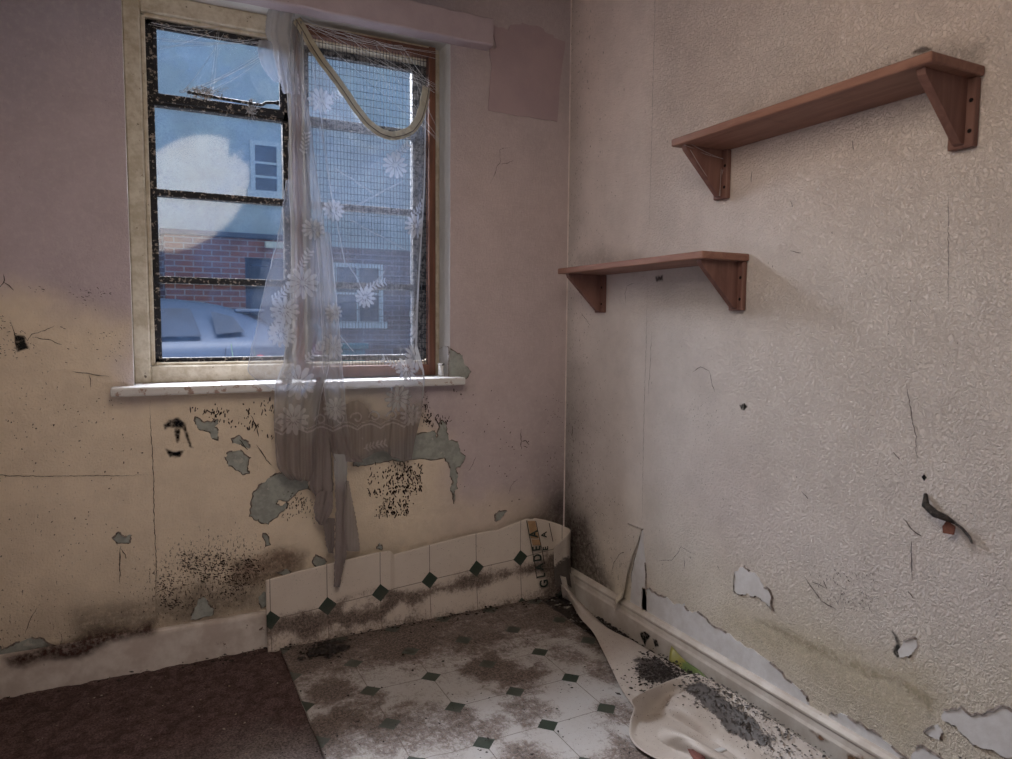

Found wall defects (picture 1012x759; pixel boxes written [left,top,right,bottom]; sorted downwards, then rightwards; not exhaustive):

peeling [439,346,471,379]
peeling [193,416,219,441]
peeling [225,435,251,475]
peeling [353,420,466,504]
peeling [249,472,311,547]
leakage [367,461,423,519]
peeling [942,522,956,535]
leakage [157,549,295,614]
leakage [9,622,153,665]
peeling [630,529,810,705]
peeling [898,636,918,658]
peeling [828,705,1012,759]